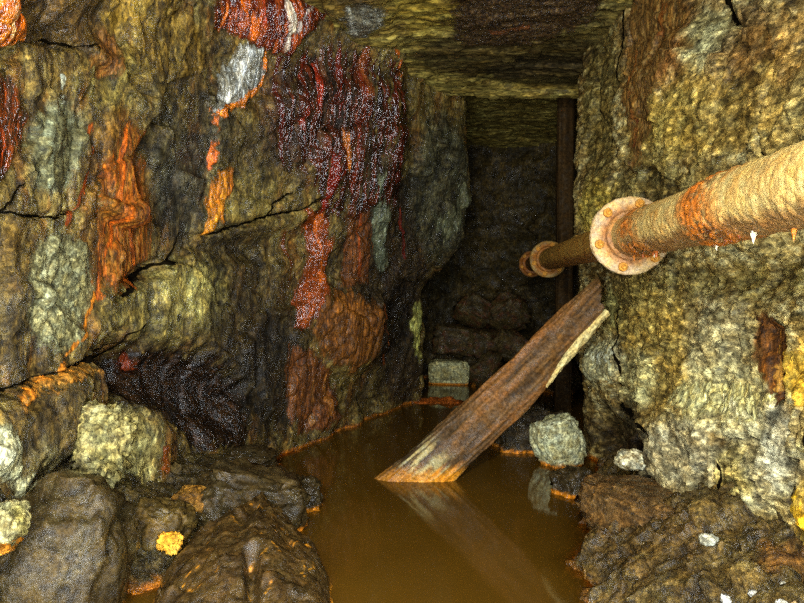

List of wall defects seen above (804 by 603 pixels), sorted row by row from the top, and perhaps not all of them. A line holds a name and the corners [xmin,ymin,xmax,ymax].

crack [725,0,741,26]
corrosion [0,73,28,178]
corrosion [201,141,234,235]
corrosion [272,40,409,329]